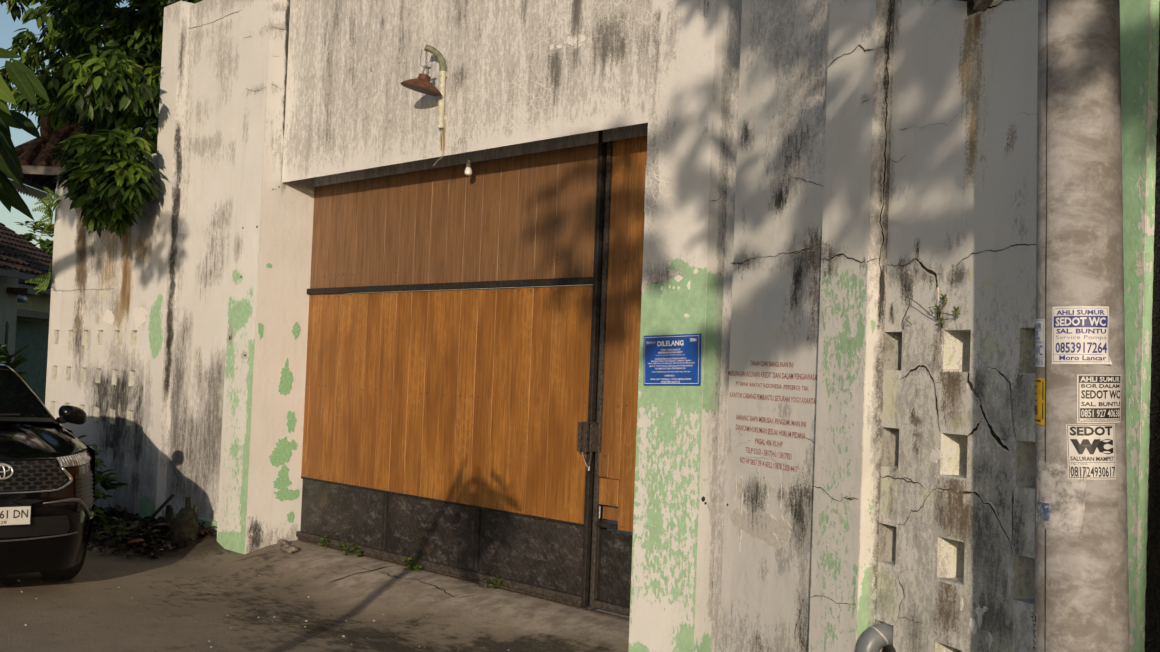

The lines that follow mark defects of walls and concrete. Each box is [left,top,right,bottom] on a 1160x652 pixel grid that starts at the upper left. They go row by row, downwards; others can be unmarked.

damp [550,0,659,105]
rust [959,14,985,174]
damp [771,127,808,211]
crack [733,0,1036,329]
damp [73,207,96,366]
damp [164,124,222,496]
flaking render [642,268,699,294]
damp [790,226,832,339]
damp [88,369,144,464]
peeling [269,410,299,523]
peeling [278,358,293,395]
damp [741,470,813,549]